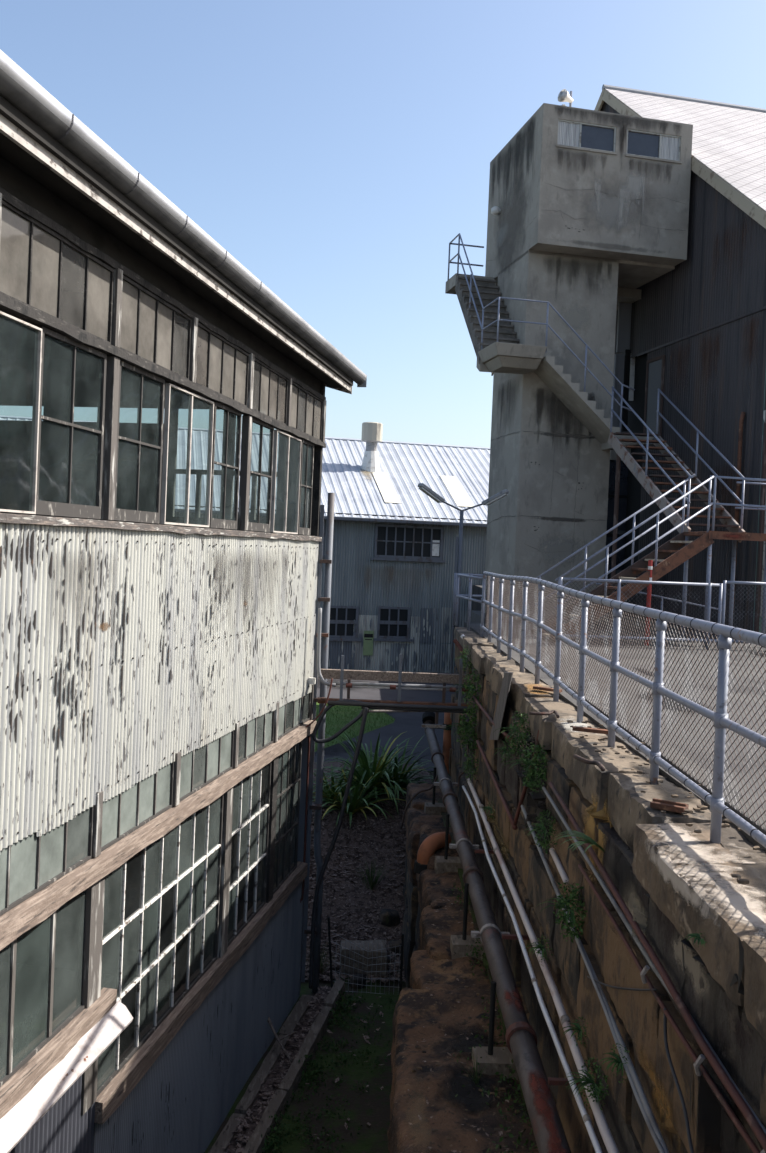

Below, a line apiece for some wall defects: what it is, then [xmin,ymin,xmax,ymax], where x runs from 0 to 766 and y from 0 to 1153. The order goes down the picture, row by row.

water stain [492,122,534,266]
water stain [559,108,680,151]
peeling [0,524,67,742]
peeling [53,527,133,802]
peeling [158,543,179,684]
peeling [191,567,233,693]